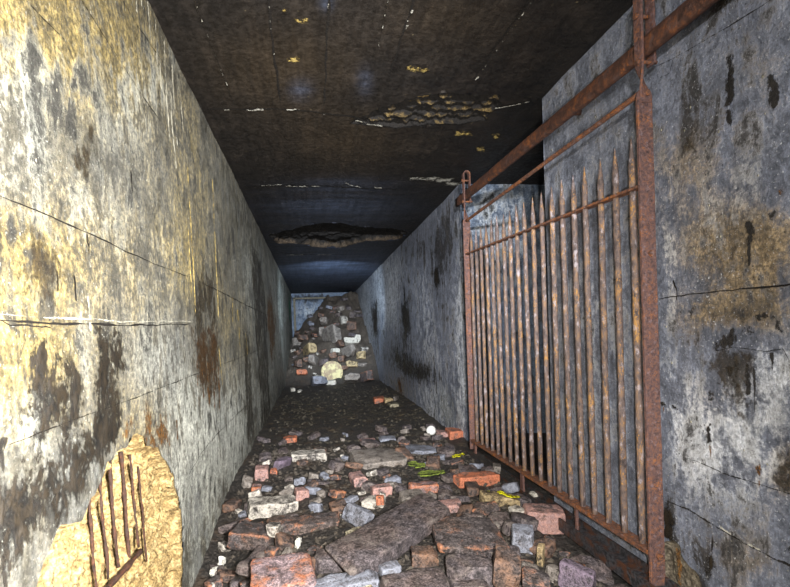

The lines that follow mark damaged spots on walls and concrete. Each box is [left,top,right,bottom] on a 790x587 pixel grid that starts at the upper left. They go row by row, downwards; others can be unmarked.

water stain [724,54,735,126]
water stain [767,74,780,108]
spalling [350,92,501,129]
spalling [269,223,407,248]
crack [1,196,263,313]
crack [661,280,790,300]
crack [0,314,191,328]
corrosion [189,324,222,408]
water stain [704,313,782,418]
water stain [0,437,8,472]
spalling [37,433,183,587]